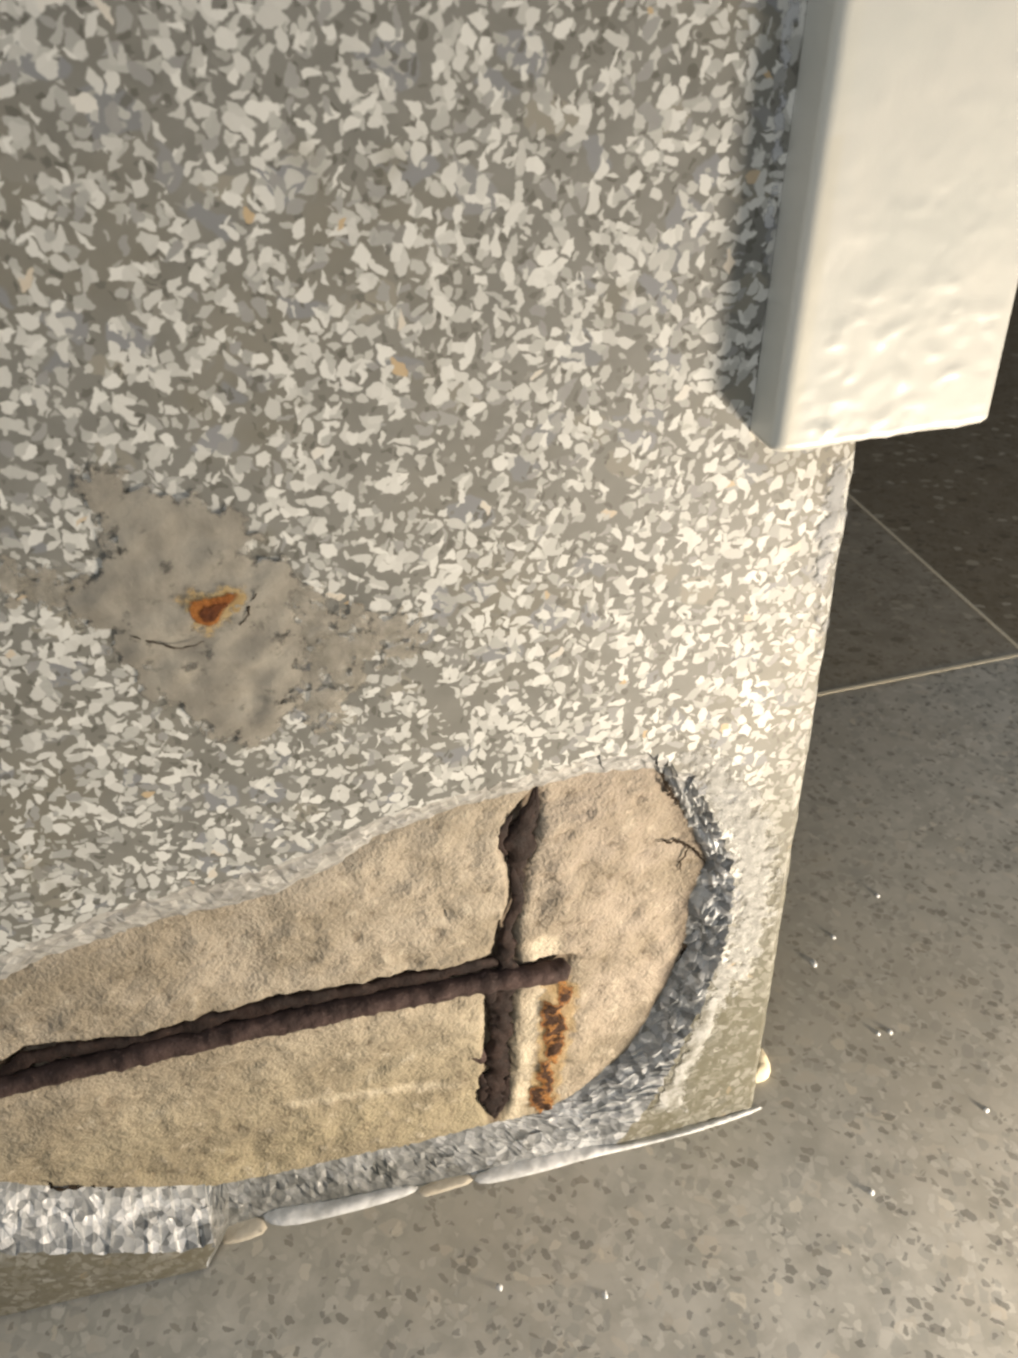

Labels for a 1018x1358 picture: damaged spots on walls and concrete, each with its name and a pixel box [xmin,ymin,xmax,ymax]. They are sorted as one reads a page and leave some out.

corrosion [175,586,247,637]
crack [659,772,681,805]
crack [657,838,706,872]
spalling [0,752,736,1268]
corrosion [529,981,574,1114]